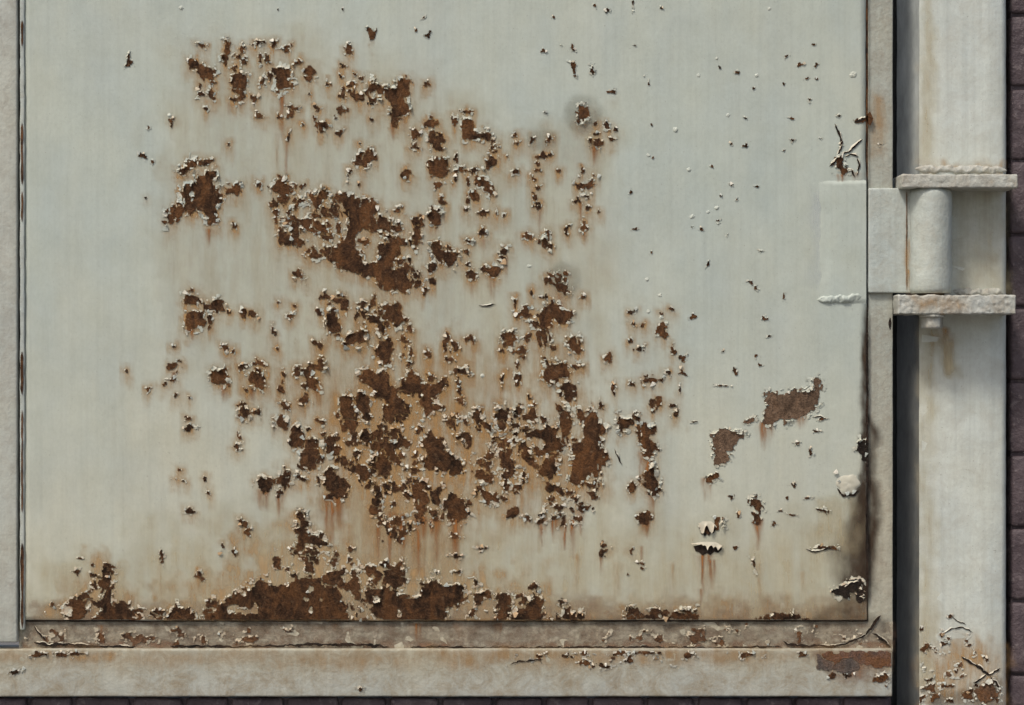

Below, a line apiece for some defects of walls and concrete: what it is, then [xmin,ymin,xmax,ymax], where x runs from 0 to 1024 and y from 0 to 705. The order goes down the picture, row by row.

peeling [831,151,852,176]
peeling [7,36,698,677]
corrosion [44,40,869,620]
peeling [703,373,829,485]
peeling [829,576,866,602]
peeling [919,613,1004,705]